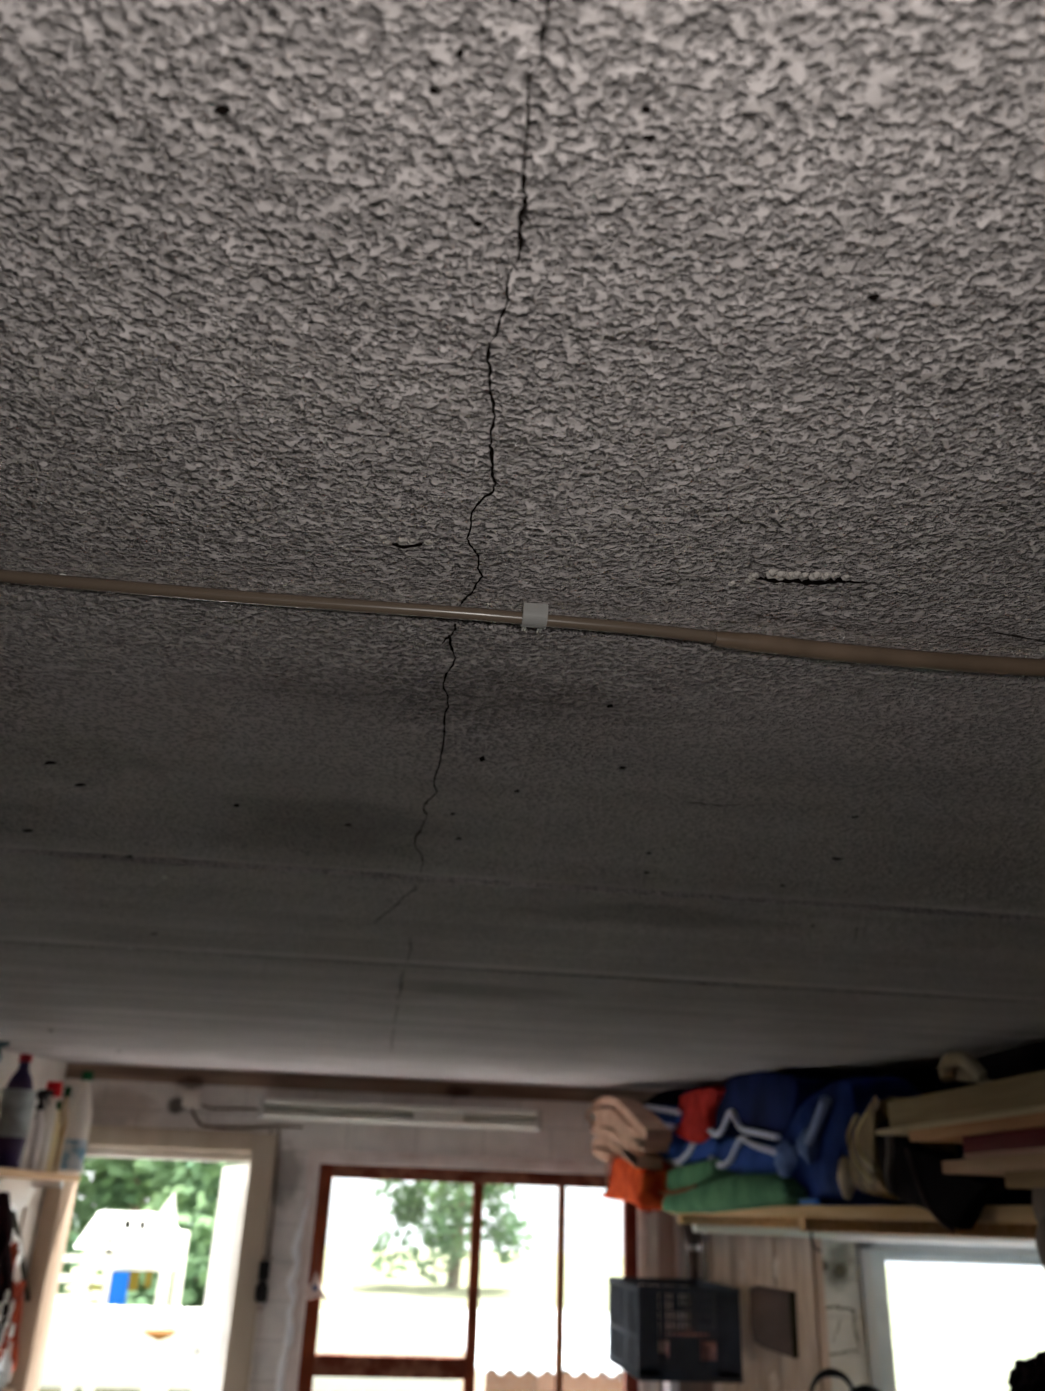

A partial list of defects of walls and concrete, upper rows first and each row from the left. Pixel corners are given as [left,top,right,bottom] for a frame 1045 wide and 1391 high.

crack [374,0,552,924]